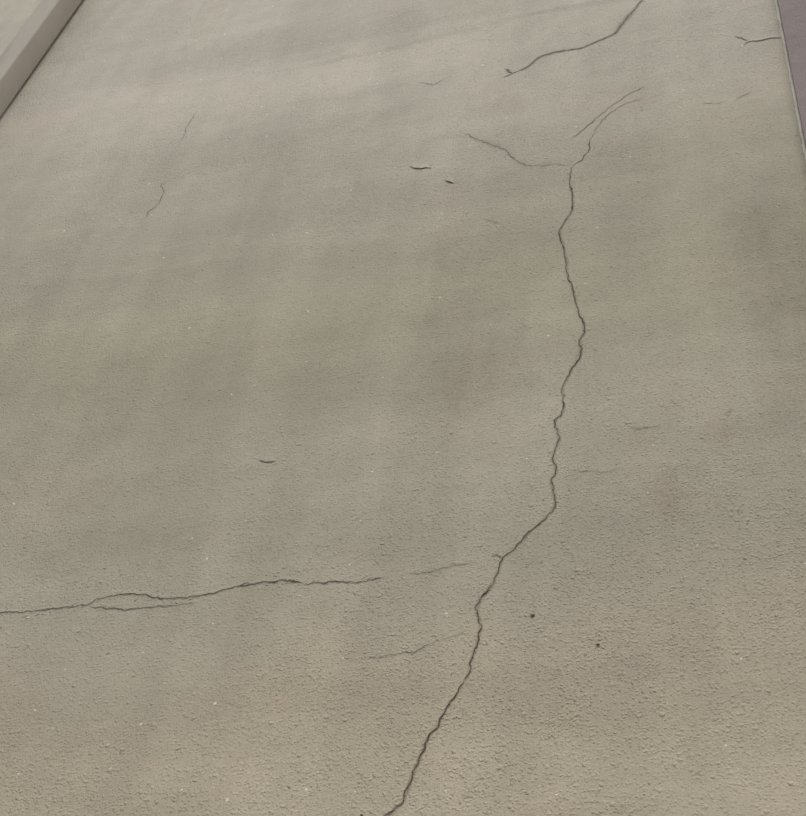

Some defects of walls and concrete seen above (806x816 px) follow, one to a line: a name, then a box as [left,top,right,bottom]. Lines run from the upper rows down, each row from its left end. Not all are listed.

crack [504,0,646,77]
crack [735,35,782,44]
crack [369,89,639,816]
crack [0,574,381,628]